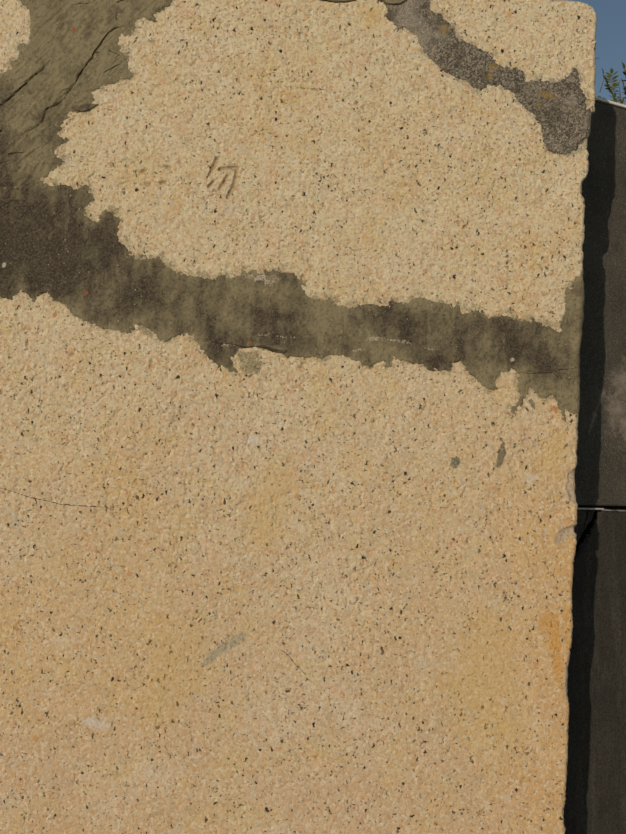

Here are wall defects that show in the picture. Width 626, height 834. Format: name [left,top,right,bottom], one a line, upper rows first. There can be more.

damp [345,0,396,52]
crack [0,0,123,163]
damp [239,269,288,291]